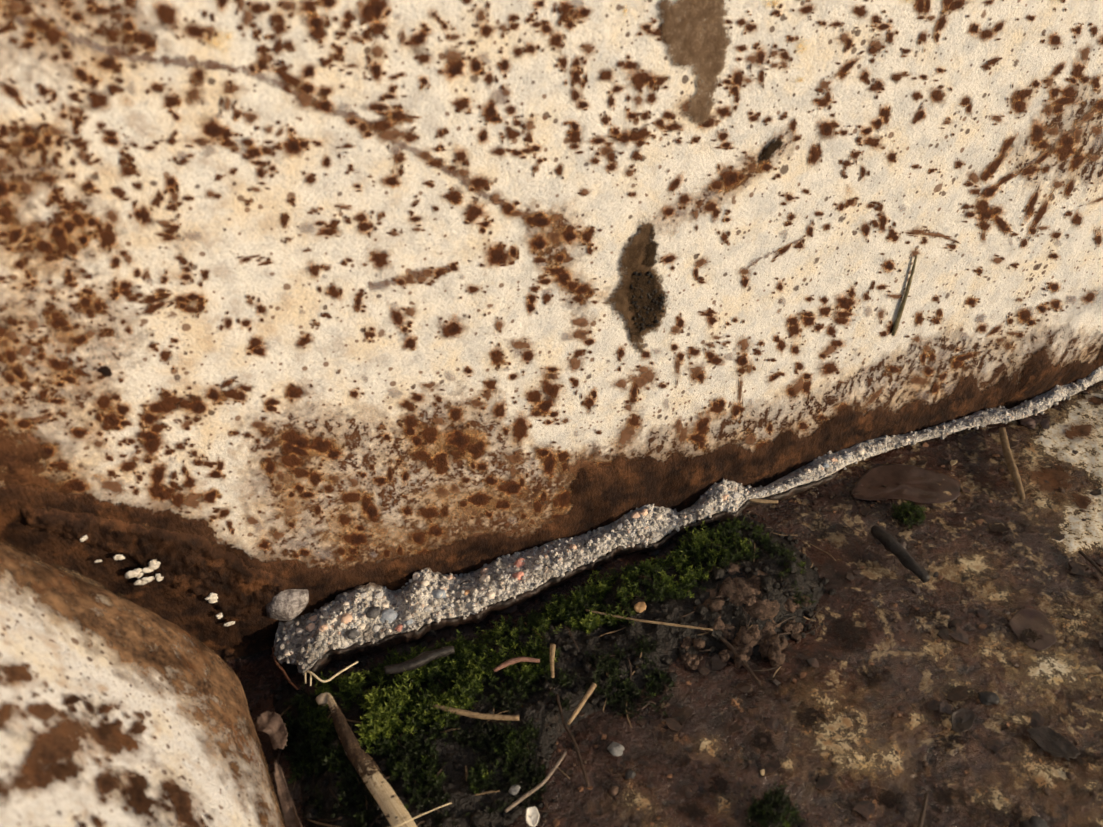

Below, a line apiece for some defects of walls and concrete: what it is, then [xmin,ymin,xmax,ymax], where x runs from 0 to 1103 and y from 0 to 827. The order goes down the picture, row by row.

rust [95,83,322,190]
rust [155,0,598,192]
rust [564,0,1036,262]
rust [955,23,1103,259]
rust [220,295,267,357]
rust [297,264,367,349]
rust [672,308,745,365]
rust [774,282,858,376]
rust [616,347,711,428]
rust [0,653,214,827]
damp [794,704,826,730]
damp [936,733,964,754]